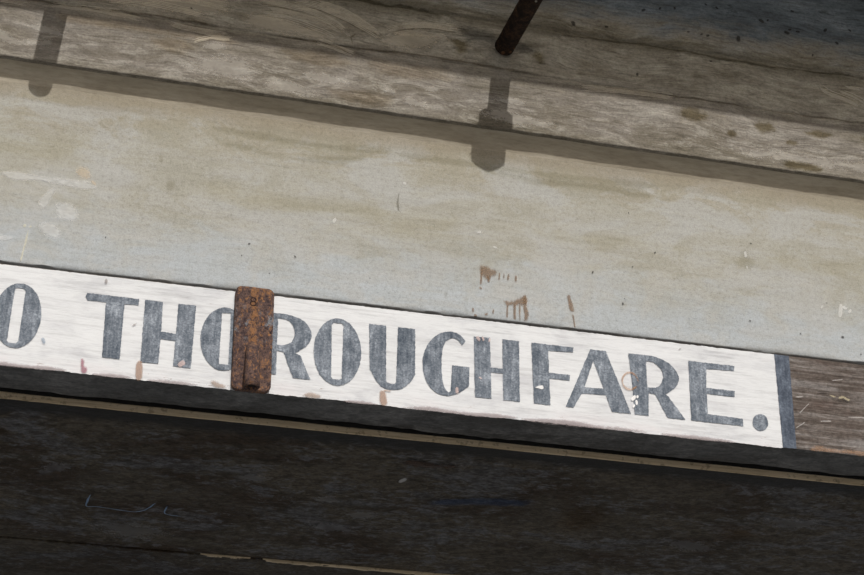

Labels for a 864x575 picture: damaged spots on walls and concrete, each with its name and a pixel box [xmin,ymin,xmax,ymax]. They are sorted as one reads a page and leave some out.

corrosion [479,267,517,289]
corrosion [506,296,529,320]